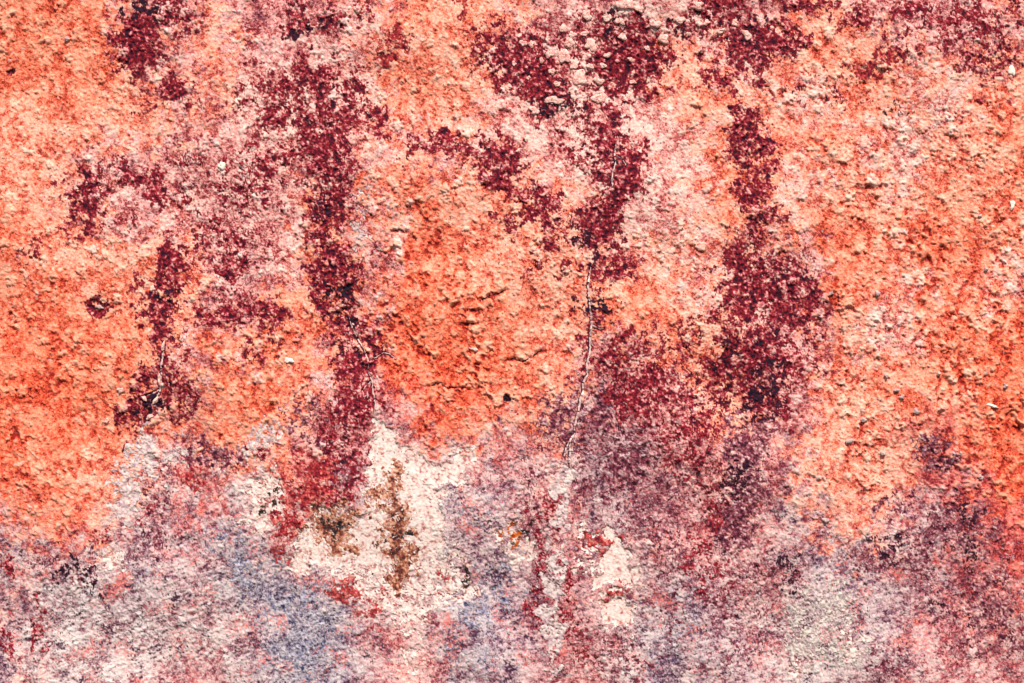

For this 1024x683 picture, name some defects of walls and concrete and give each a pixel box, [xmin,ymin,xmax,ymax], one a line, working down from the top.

crack [564,264,604,484]